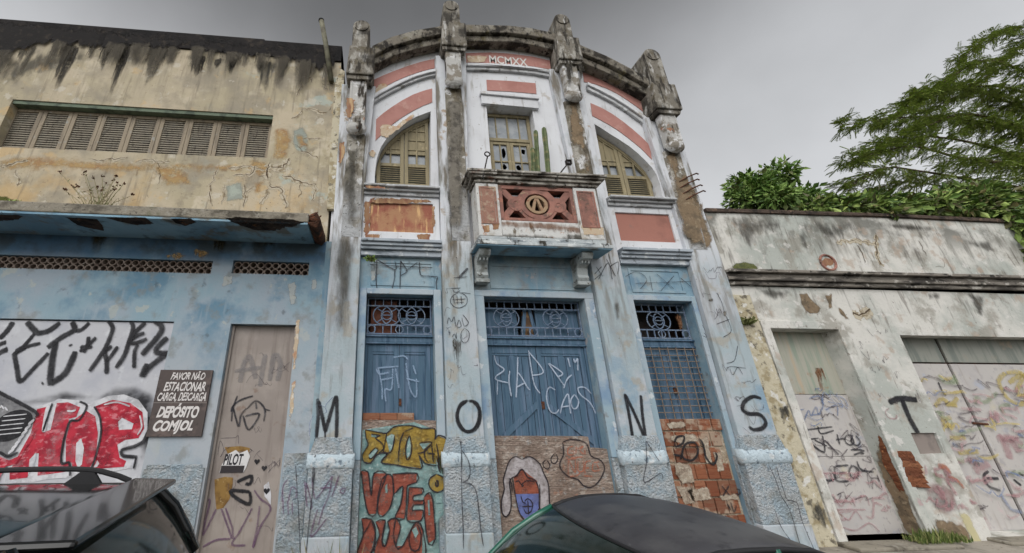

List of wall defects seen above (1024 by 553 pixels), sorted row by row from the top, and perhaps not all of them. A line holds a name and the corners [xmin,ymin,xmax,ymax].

leakage [0,21,335,85]
crack [207,66,331,208]
peeling [570,102,589,172]
spalling [66,217,154,231]
spalling [172,218,196,226]
spalling [224,217,304,231]
leakage [346,151,357,216]
peeling [667,153,712,247]
leakage [739,223,772,243]
leakage [338,240,352,319]
flaking render [800,293,848,319]
spalling [876,436,931,534]